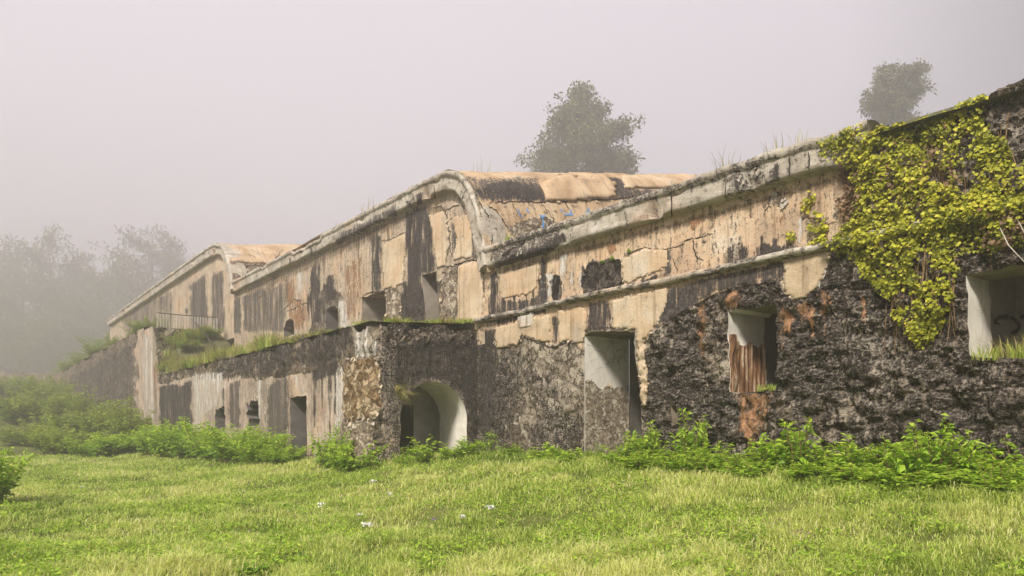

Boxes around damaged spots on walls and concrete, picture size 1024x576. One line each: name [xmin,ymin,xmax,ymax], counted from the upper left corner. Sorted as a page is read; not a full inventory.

water stain [73,192,446,442]
water stain [393,177,834,444]
crack [623,233,710,270]
rust [724,291,740,308]
rust [779,290,832,351]
flaking render [783,251,832,299]
flaking render [580,247,669,456]
spalling [339,356,382,457]
rust [737,392,772,445]